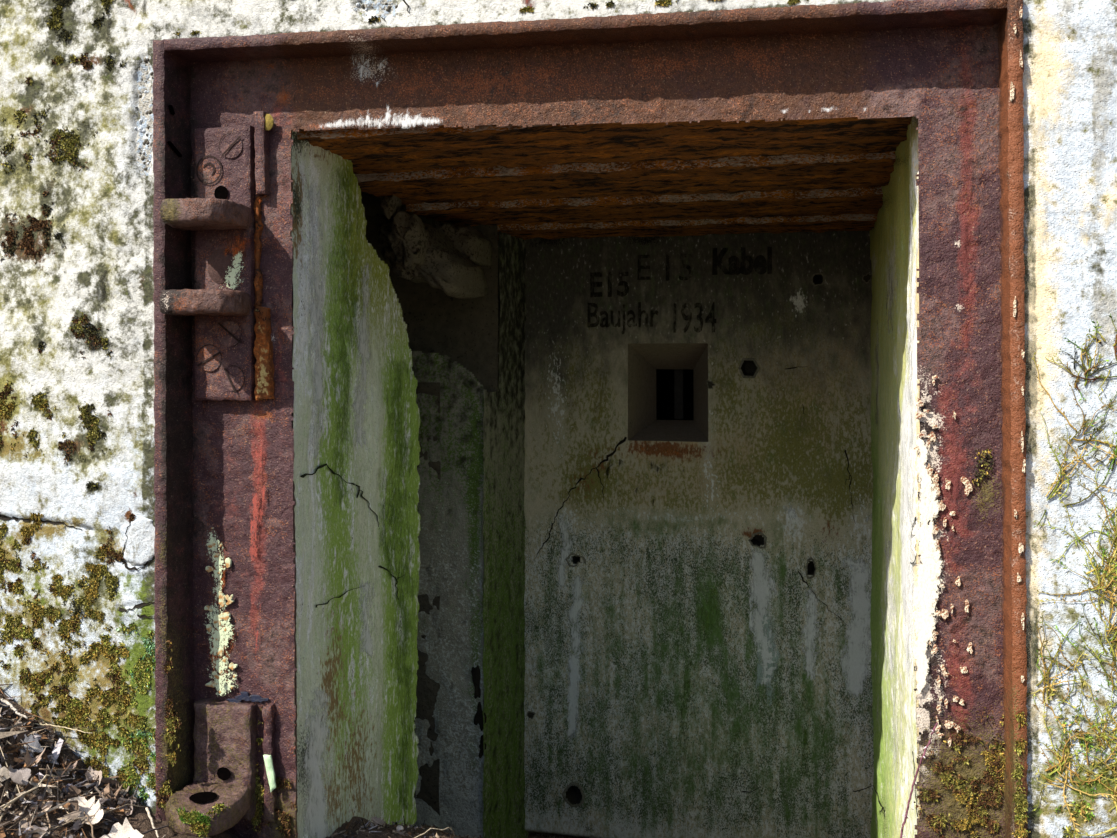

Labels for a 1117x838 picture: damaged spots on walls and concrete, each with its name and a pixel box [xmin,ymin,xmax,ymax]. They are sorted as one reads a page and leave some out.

crack [0,515,82,531]
crack [104,525,155,571]
crack [118,602,155,618]
corrosion [211,566,227,682]
crack [300,463,379,527]
damp [381,365,415,809]
damp [556,513,584,737]
damp [748,549,783,715]
damp [795,585,819,680]
peeling [914,398,973,552]
peeling [929,576,973,747]
damp [301,689,330,838]